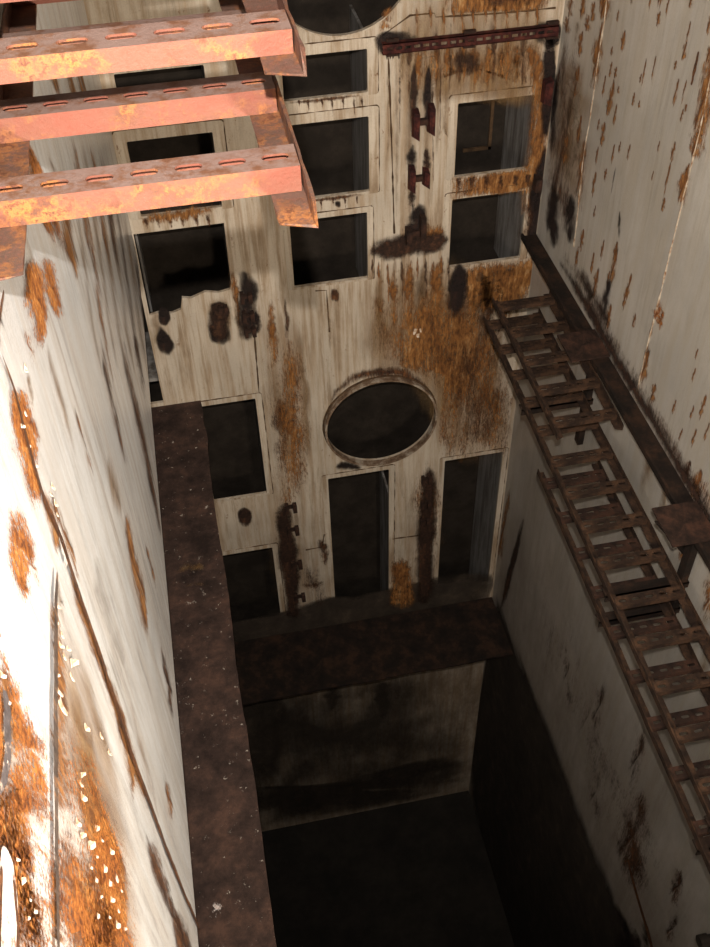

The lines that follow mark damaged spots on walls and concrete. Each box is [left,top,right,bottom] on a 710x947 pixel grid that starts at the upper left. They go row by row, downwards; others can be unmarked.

corrosion [402,0,619,235]
corrosion [592,31,630,216]
corrosion [23,259,63,362]
corrosion [43,214,161,532]
water stain [209,272,260,339]
corrosion [267,300,308,502]
water stain [371,192,467,317]
corrosion [332,258,533,455]
corrosion [560,229,710,523]
corrosion [9,512,39,602]
corrosion [0,653,136,947]
water stain [232,470,641,947]